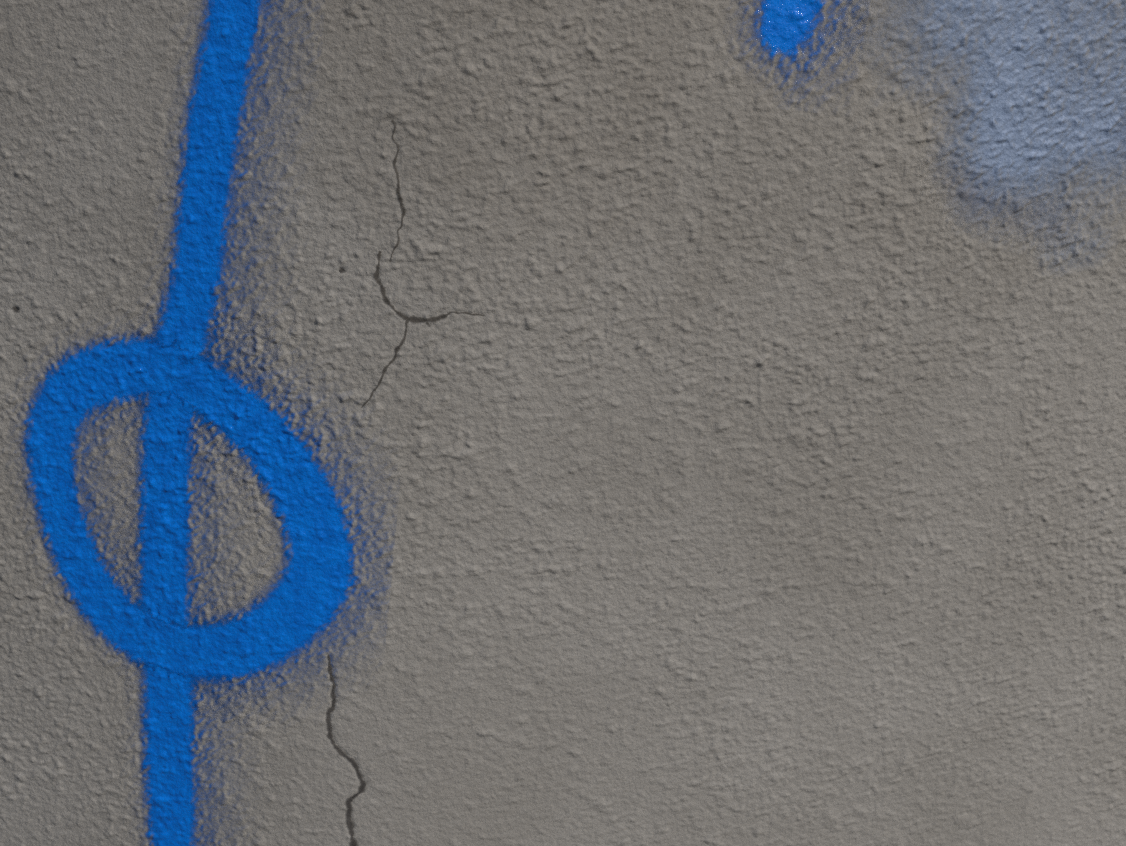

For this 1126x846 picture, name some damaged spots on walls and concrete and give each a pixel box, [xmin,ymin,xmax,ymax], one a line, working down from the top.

crack [362,120,485,407]
crack [326,655,366,846]